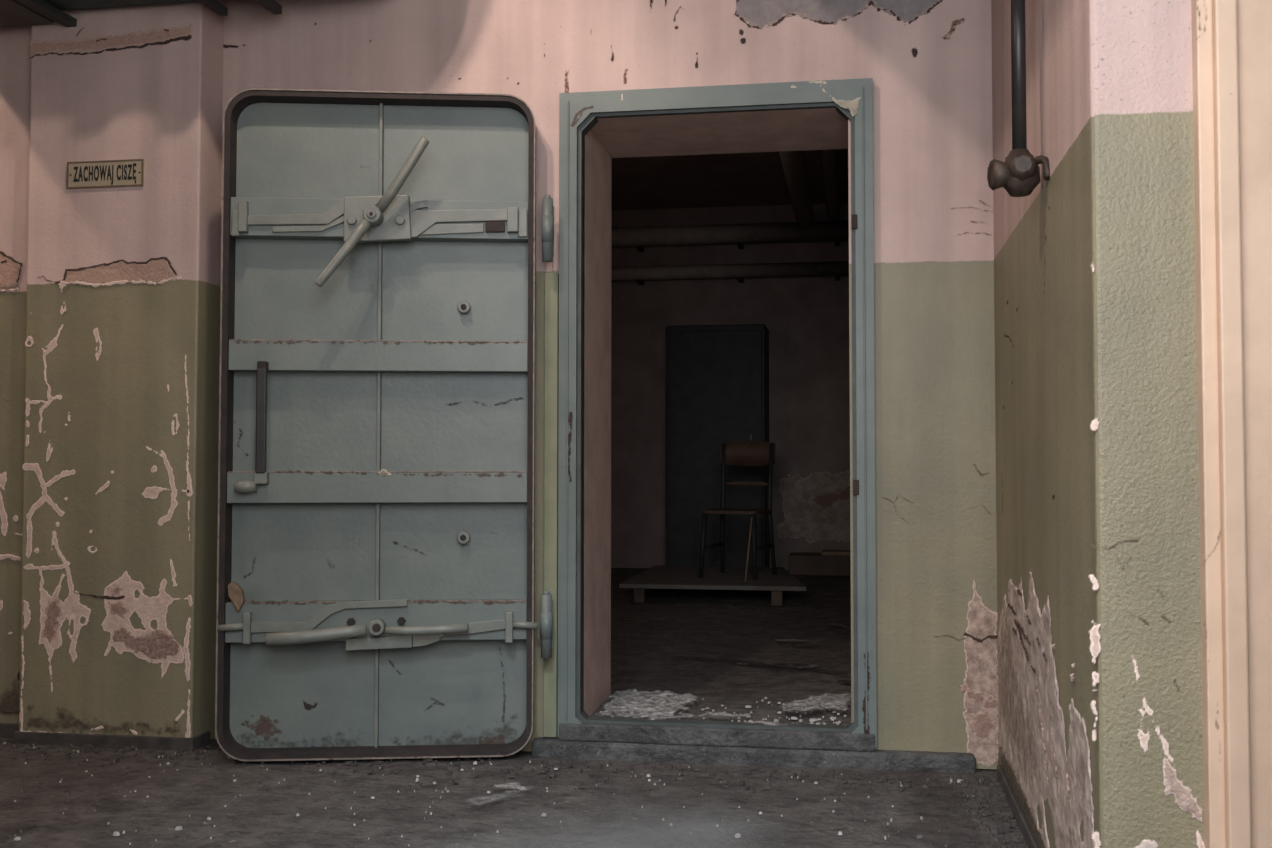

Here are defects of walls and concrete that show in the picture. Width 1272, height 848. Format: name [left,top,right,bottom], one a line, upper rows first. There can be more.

crack [29,24,193,59]
spalling [735,0,943,29]
peeling [0,251,193,738]
peeling [960,572,1101,848]
peeling [1135,697,1205,848]